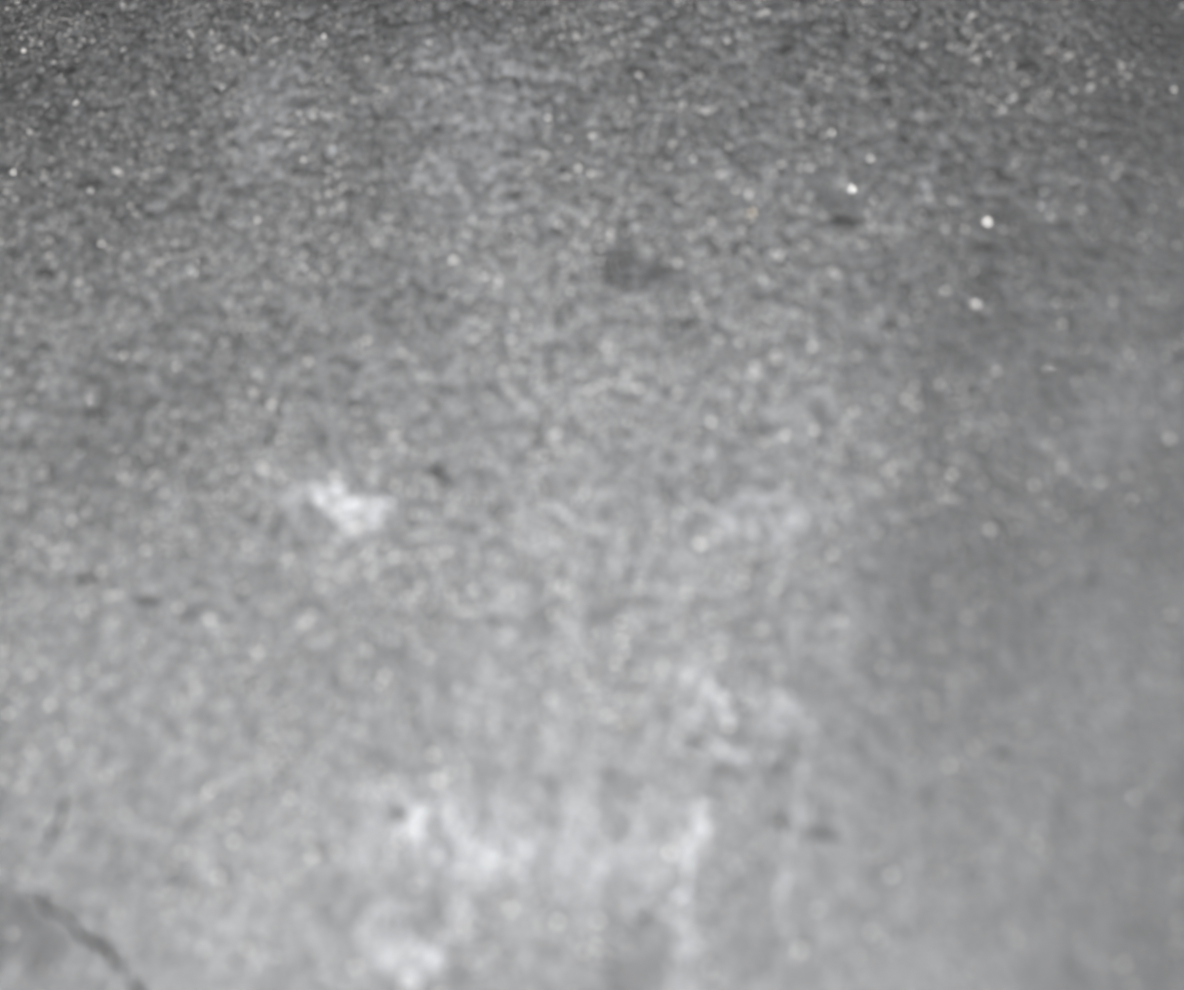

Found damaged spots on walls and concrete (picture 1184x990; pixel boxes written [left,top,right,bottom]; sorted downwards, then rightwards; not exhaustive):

crack [30,889,140,990]